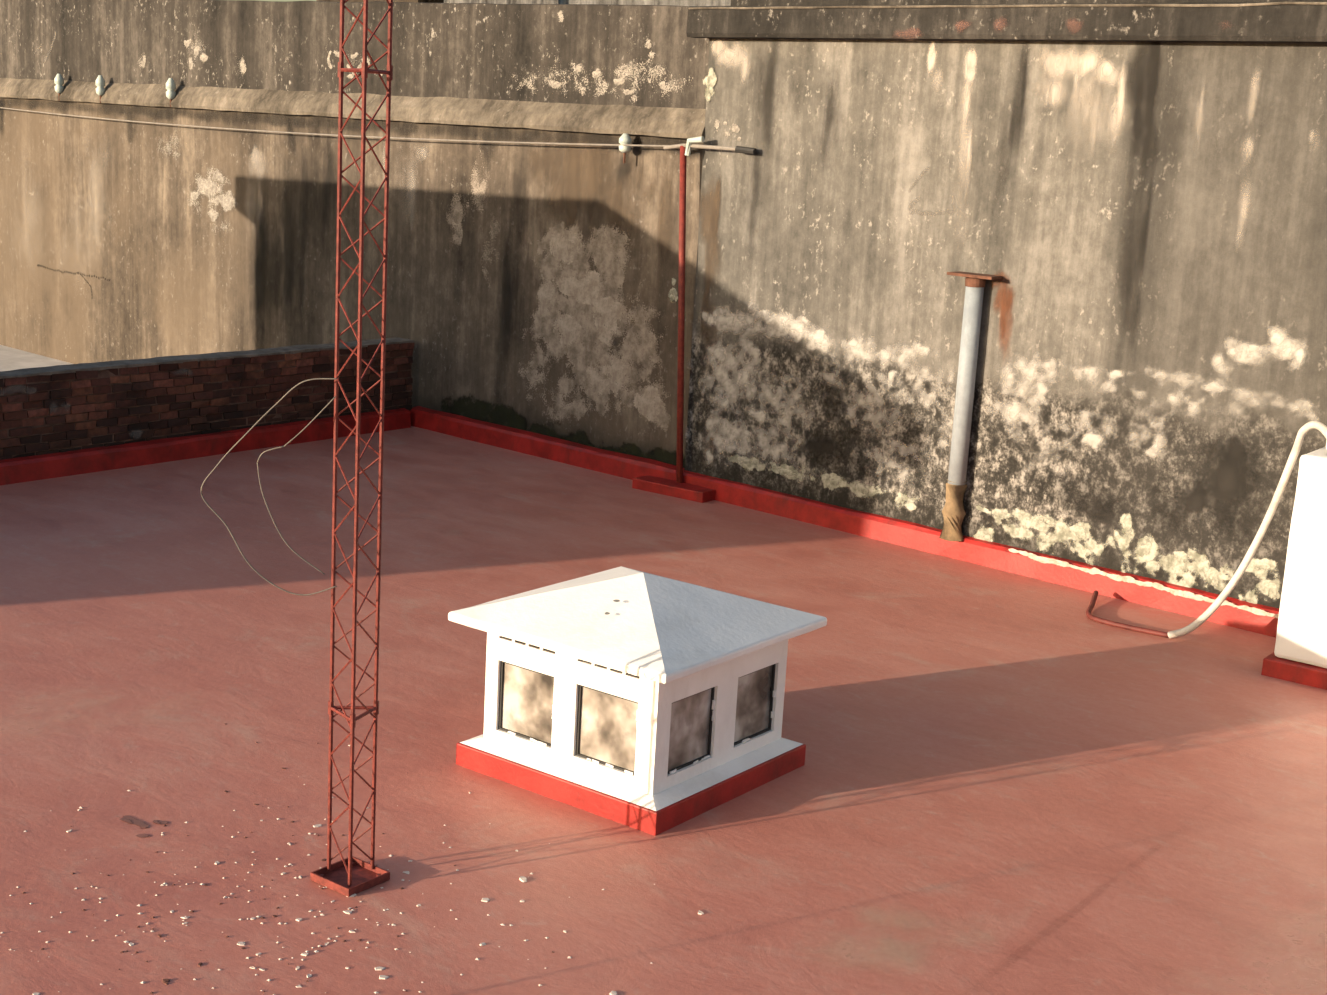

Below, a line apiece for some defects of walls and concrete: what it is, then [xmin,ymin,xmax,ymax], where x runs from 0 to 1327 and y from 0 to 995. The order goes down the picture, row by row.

water stain [0,99,83,130]
water stain [103,103,214,120]
water stain [242,112,320,145]
water stain [691,181,954,480]
corrosion [994,274,1012,346]
water stain [987,354,1056,437]
water stain [1074,367,1123,391]
water stain [1138,373,1258,414]
water stain [1277,397,1316,421]
water stain [1031,411,1114,468]
water stain [1131,419,1166,457]
water stain [1167,439,1265,529]